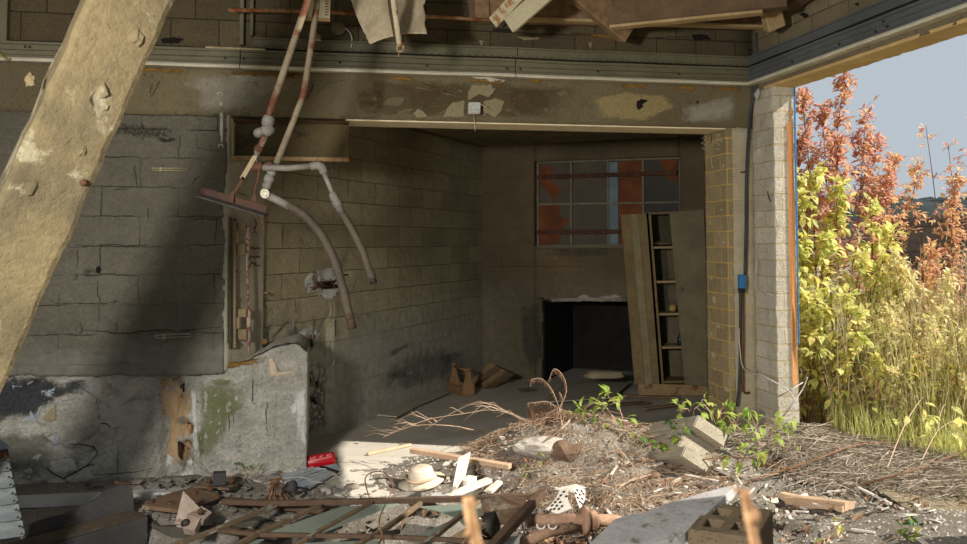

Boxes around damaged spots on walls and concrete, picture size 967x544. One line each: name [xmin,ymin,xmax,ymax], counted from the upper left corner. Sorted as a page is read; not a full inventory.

peeling [444,77,505,117]
spalling [615,84,648,110]
crack [67,241,164,266]
crack [50,281,220,334]
crack [46,443,152,483]